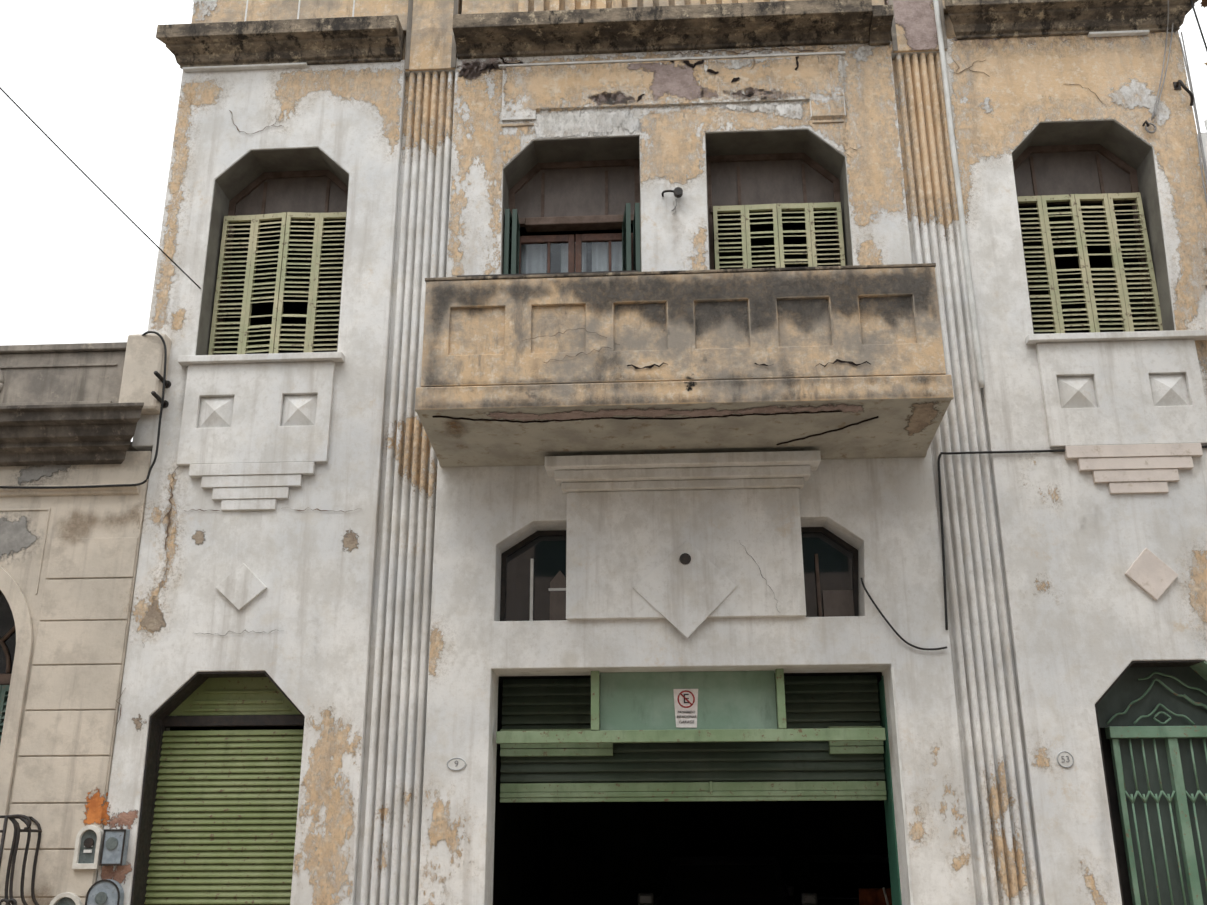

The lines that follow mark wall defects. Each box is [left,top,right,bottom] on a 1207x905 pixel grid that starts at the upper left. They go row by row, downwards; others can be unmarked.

peeling [151,79,223,331]
peeling [275,0,1207,373]
crack [523,328,666,369]
crack [815,359,871,367]
crack [433,410,879,445]
flaking render [130,473,206,636]
corrosion [83,787,110,826]
peeling [294,706,362,905]
peeling [374,805,388,870]
peeling [403,790,474,905]
peeling [909,785,971,871]
peeling [986,760,1028,900]